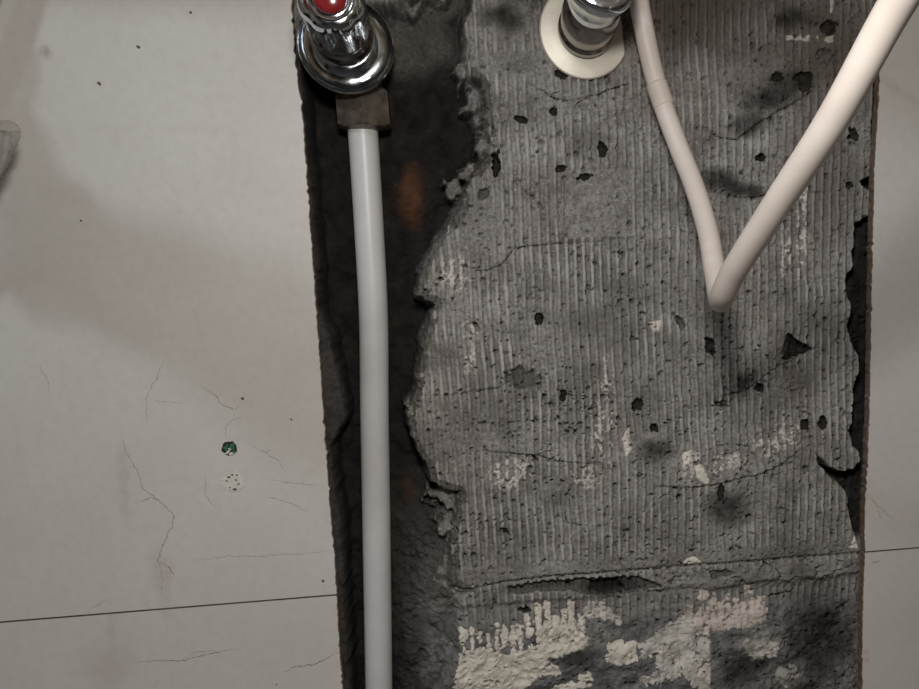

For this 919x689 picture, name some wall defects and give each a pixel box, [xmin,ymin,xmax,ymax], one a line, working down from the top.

spalling [847,126,859,141]
spalling [597,141,608,157]
spalling [405,67,501,592]
spalling [704,337,716,357]
spalling [631,398,644,411]
spalling [800,415,828,430]
peeling [622,427,632,456]
peeling [682,450,725,502]
crack [674,463,782,489]
peeling [682,584,766,618]
spalling [458,575,662,660]
peeling [553,681,578,689]